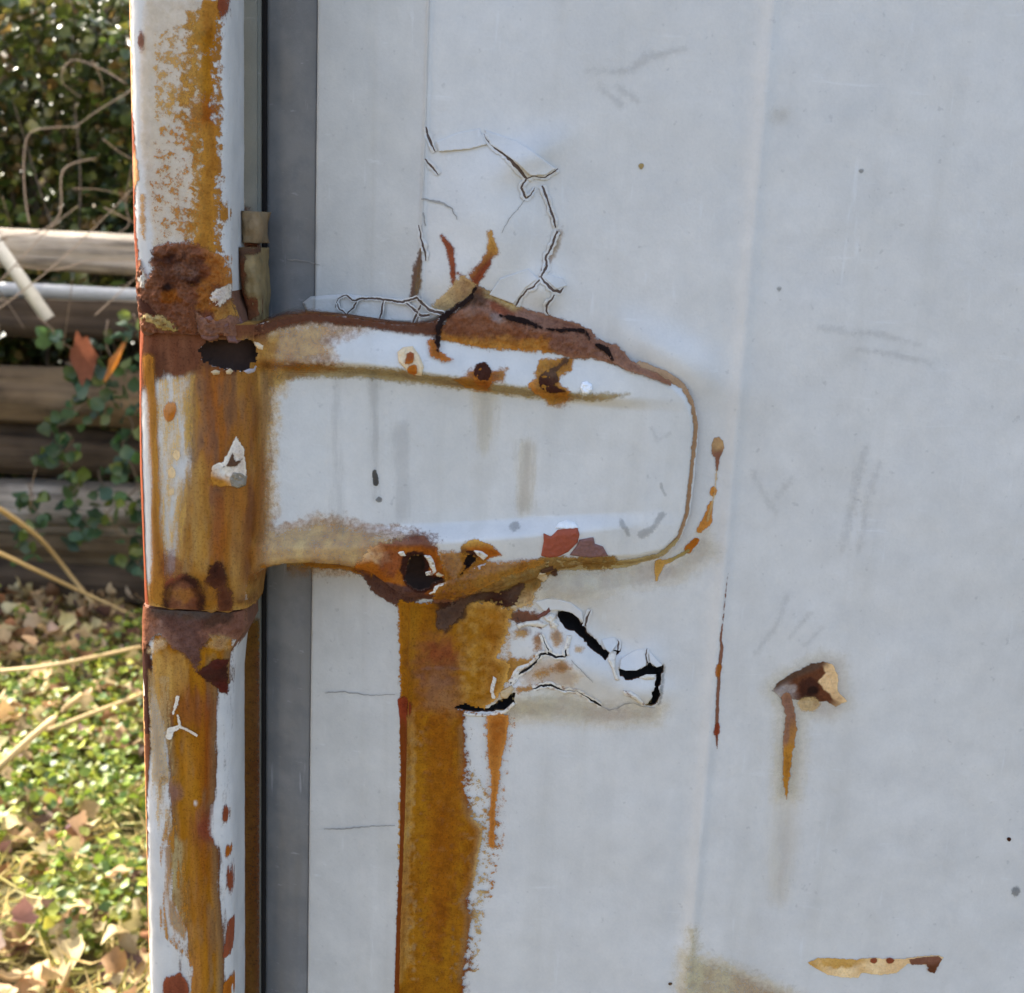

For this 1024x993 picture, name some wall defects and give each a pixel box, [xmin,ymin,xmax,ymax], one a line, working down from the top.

crack [416,126,457,261]
crack [481,133,565,315]
spalling [198,339,258,372]
crack [334,293,445,323]
peeling [210,437,246,487]
corrosion [129,0,724,993]
spalling [455,656,539,711]
spalling [536,598,663,705]